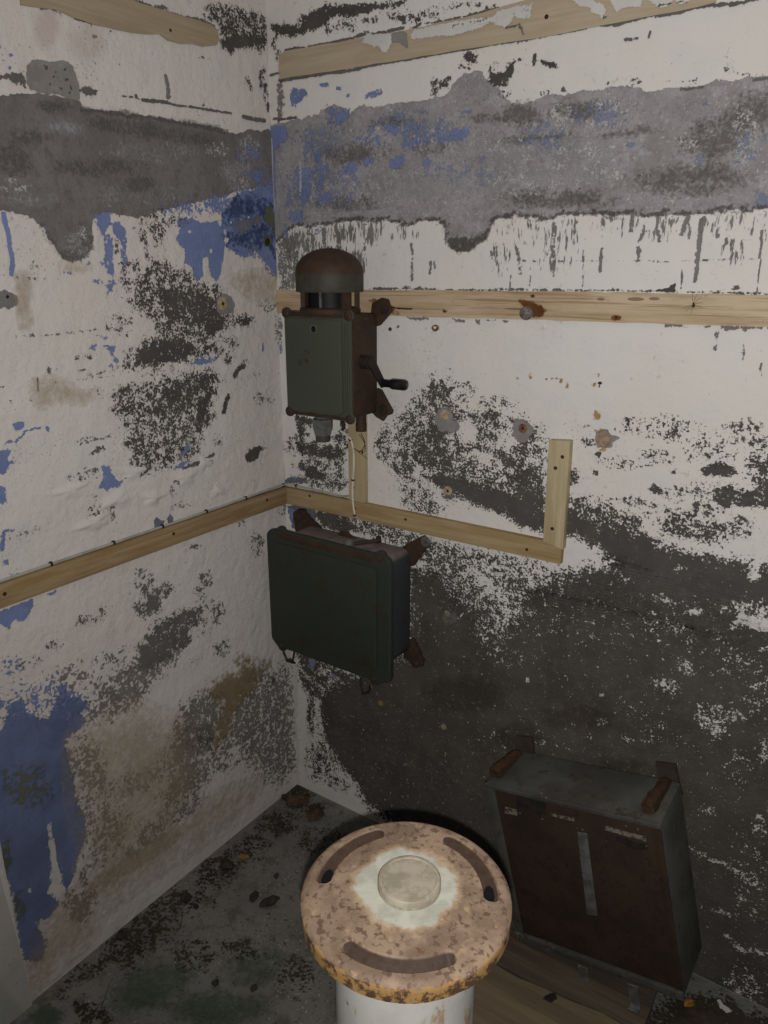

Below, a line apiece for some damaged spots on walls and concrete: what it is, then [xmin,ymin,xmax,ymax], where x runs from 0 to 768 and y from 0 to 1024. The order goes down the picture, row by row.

spalling [0,0,768,536]
water stain [629,213,661,262]
water stain [679,214,706,289]
water stain [756,229,764,293]
rust [518,295,545,318]
water stain [210,657,271,753]
peeling [52,413,768,1009]